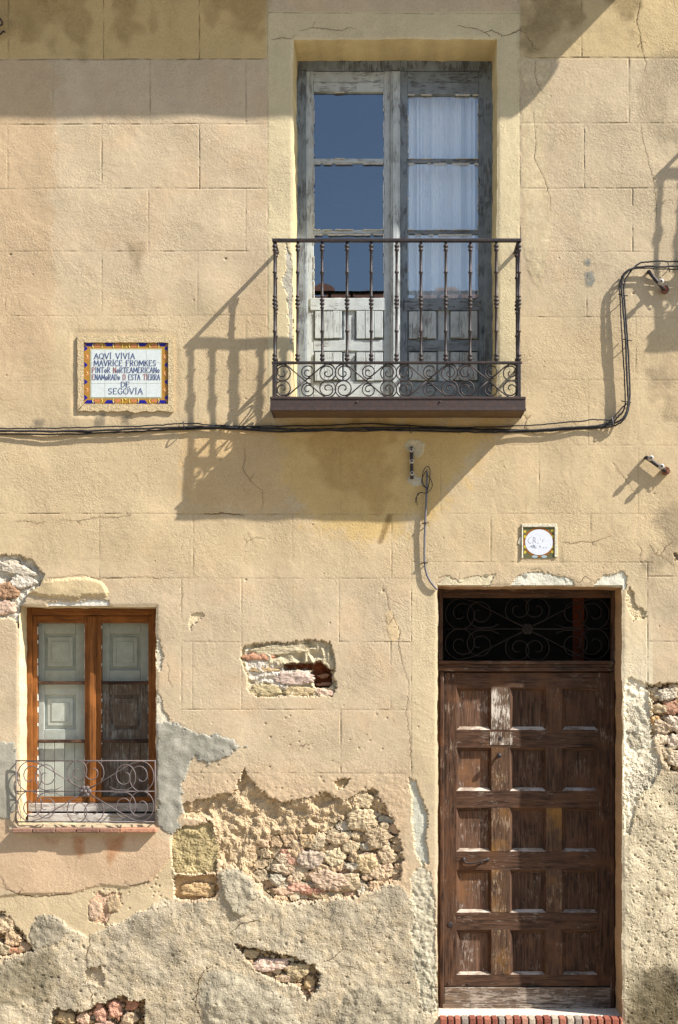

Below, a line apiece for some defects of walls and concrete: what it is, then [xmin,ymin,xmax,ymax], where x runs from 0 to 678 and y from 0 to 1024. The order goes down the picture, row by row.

crack [215,448,263,542]
spalling [0,555,45,624]
flaking render [438,574,495,585]
flaking render [511,572,574,585]
flaking render [594,571,647,621]
spalling [241,640,337,697]
spalling [626,683,678,771]
spalling [172,770,429,905]
spalling [0,911,33,956]
spalling [89,891,121,925]
spalling [237,945,320,997]
spalling [53,995,145,1024]